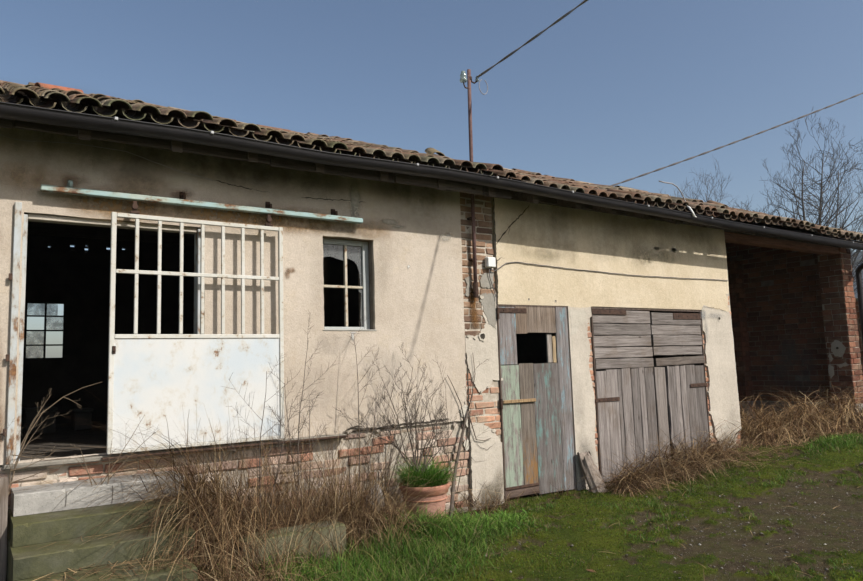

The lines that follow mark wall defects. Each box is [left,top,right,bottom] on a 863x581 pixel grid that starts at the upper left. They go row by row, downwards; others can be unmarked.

flaking render [460,192,497,341]
crack [493,197,529,302]
flaking render [828,340,848,378]
flaking render [0,365,503,529]